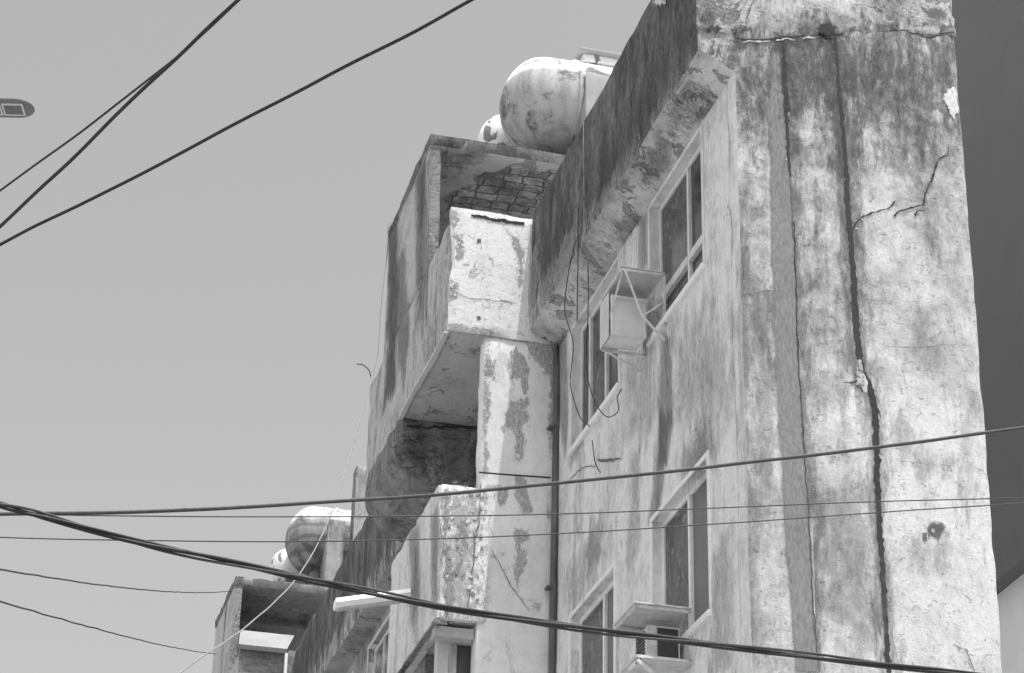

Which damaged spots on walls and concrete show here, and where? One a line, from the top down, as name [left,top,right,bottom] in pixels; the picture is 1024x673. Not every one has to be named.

crack [890,22,955,40]
spalling [933,87,959,120]
crack [471,214,525,225]
spalling [442,167,557,260]
spalling [447,316,493,336]
peeling [481,342,553,475]
damp [658,349,671,465]
crack [737,34,961,673]
spalling [438,476,532,623]
crack [467,484,549,618]